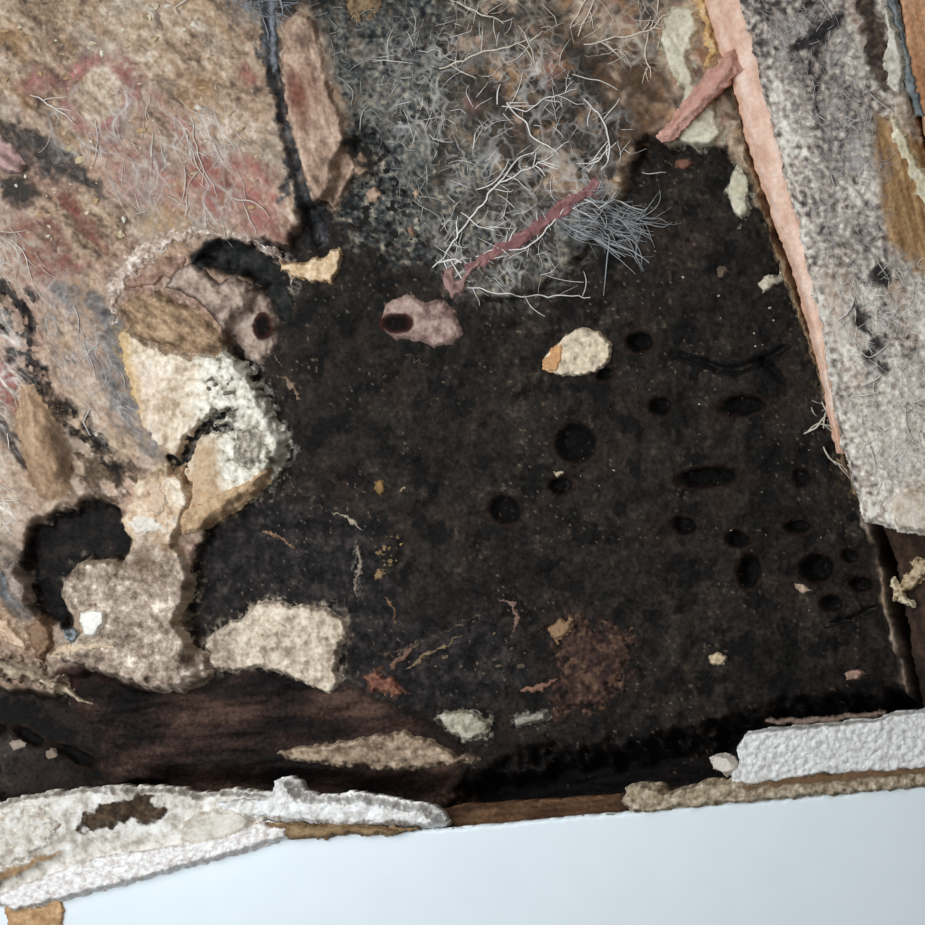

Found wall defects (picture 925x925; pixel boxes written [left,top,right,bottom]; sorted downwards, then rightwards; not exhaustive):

peeling [281,12,391,212]
damp [248,0,662,309]
peeling [661,0,723,108]
peeling [678,100,725,151]
peeling [854,0,925,117]
peeling [890,111,925,204]
peeling [729,85,821,382]
damp [868,263,891,287]
mould [853,304,889,373]
spalling [0,135,925,841]
flaking render [0,783,290,911]